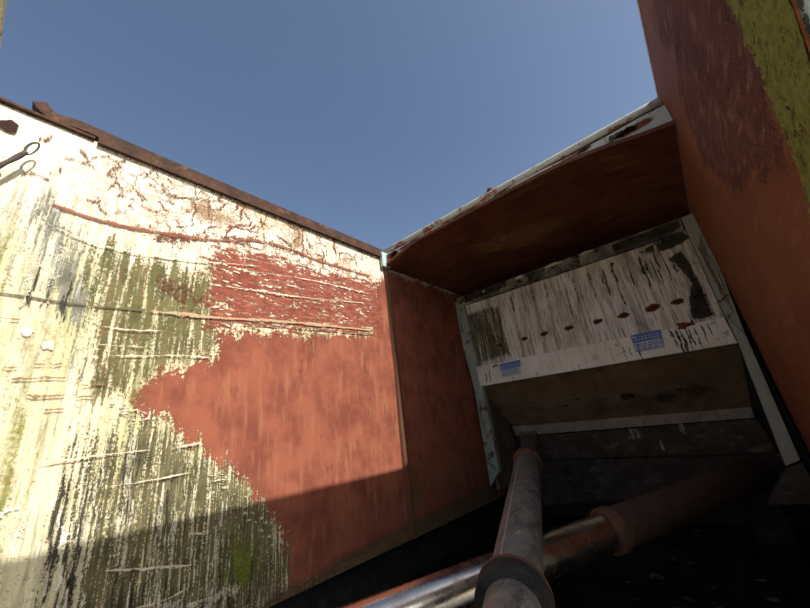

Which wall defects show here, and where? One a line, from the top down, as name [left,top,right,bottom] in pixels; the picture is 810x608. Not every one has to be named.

crack [21,149,363,264]
peeling [110,224,509,594]
leakage [34,422,107,608]
leakage [109,428,254,608]